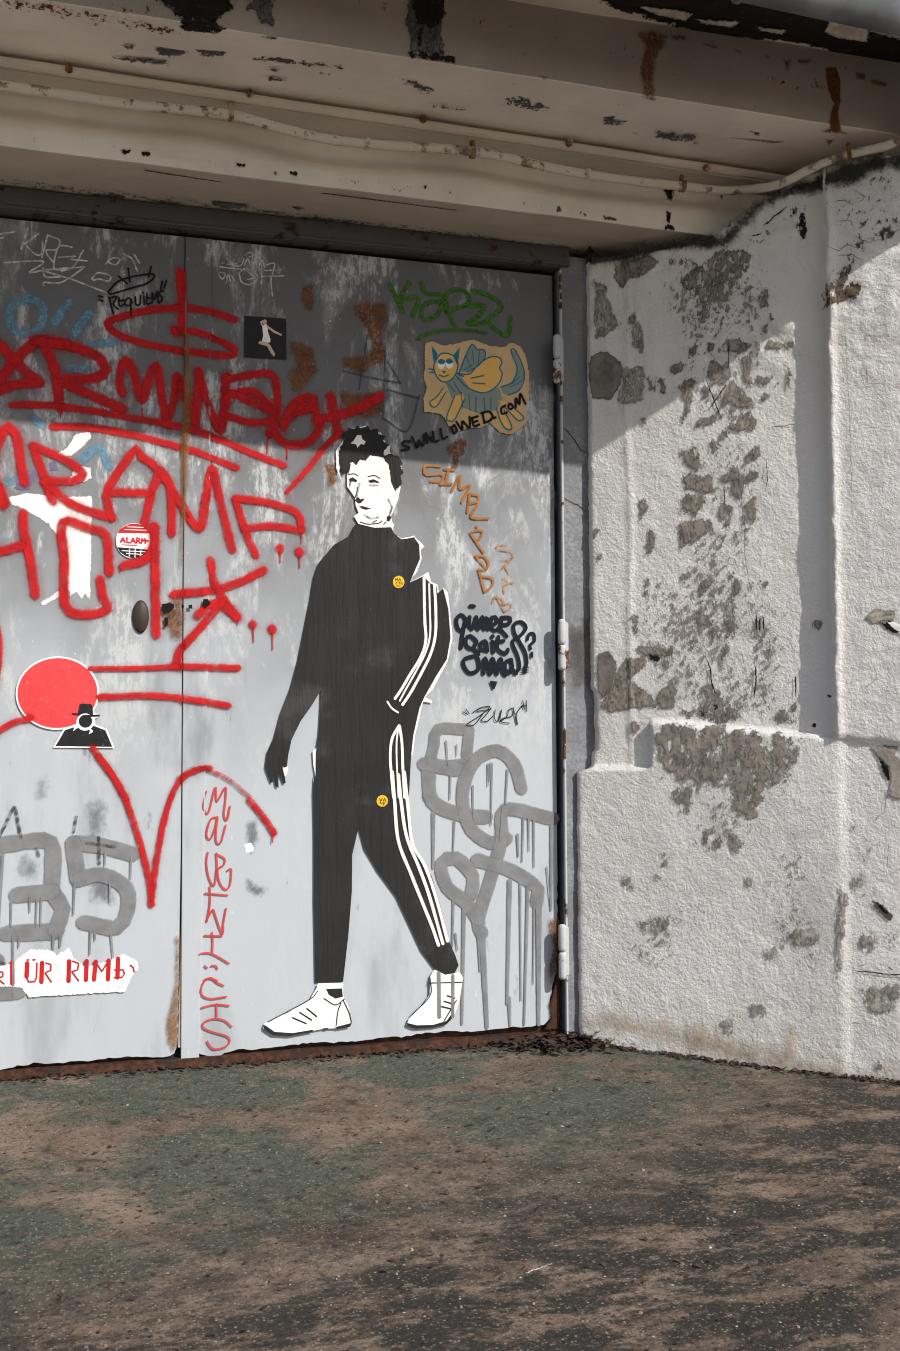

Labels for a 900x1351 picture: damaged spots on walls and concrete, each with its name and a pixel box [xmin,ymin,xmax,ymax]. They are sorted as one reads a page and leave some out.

rust [599,0,900,144]
peeling [588,200,816,854]
flaking render [864,608,900,633]